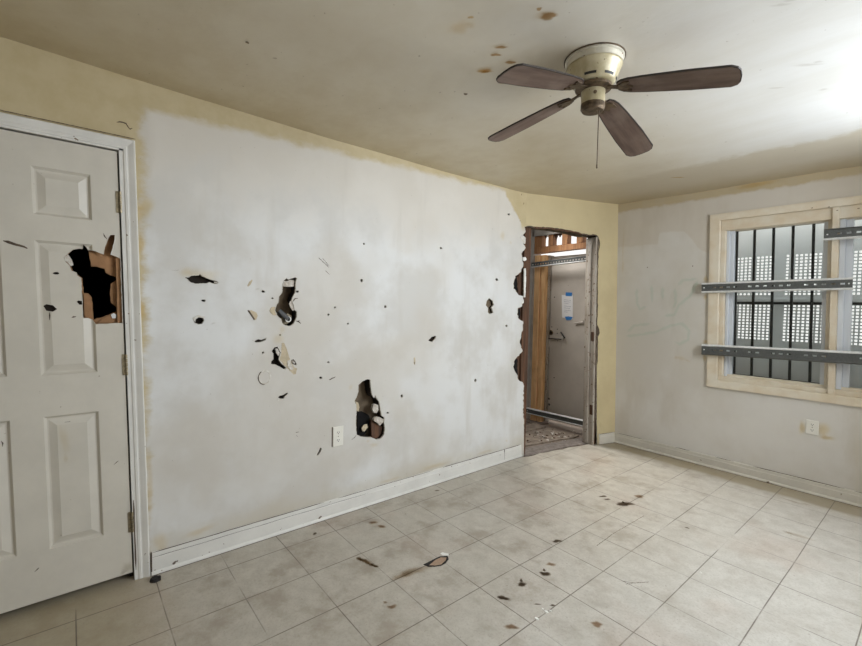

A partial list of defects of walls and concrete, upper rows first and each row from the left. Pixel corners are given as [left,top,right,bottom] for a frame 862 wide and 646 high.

spalling [262,277,299,375]
spalling [513,226,600,456]
spalling [354,379,389,440]